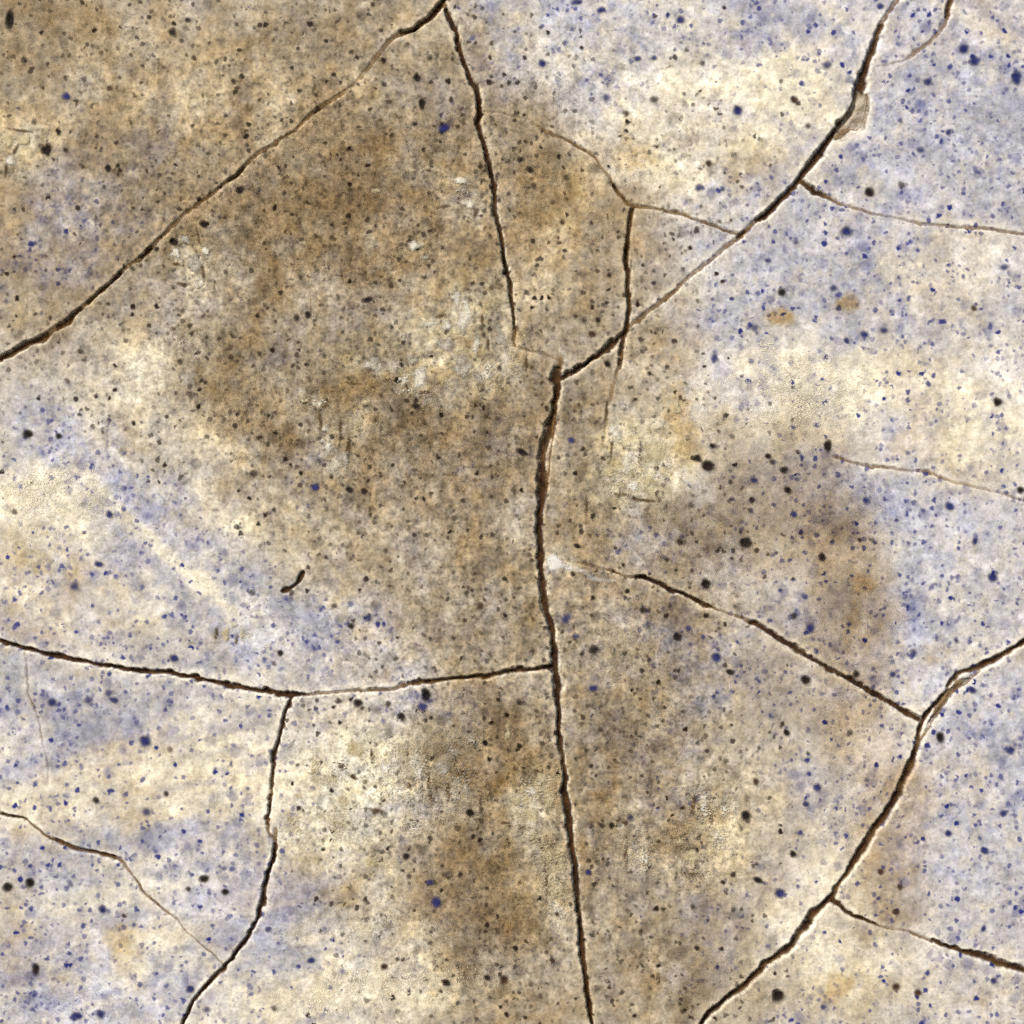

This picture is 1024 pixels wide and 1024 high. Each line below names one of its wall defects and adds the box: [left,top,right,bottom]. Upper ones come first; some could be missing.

crack [0,92,344,362]
crack [368,0,534,352]
crack [908,0,953,58]
crack [910,221,1024,235]
crack [536,0,899,1024]
crack [835,457,1008,496]
crack [0,639,554,1024]
crack [603,569,1024,1024]